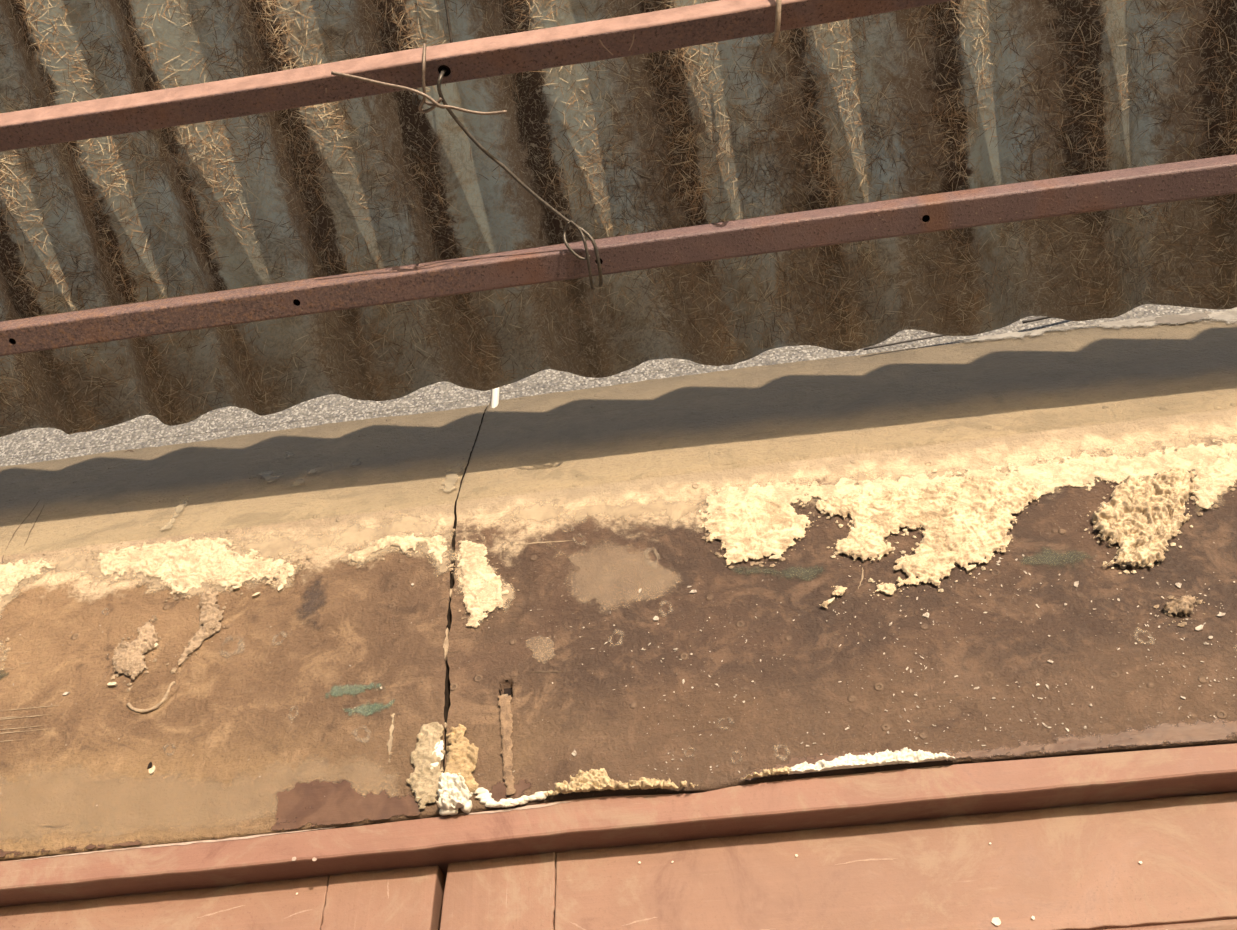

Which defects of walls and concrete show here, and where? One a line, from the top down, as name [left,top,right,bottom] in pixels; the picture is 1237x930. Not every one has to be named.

spalling [698,434,1237,597]
peeling [0,553,59,616]
peeling [81,498,312,692]
peeling [341,529,520,627]
crack [438,408,487,773]
spalling [819,586,847,609]
spalling [1154,595,1205,627]
corrosion [498,680,516,795]
spalling [456,768,698,815]
spalling [737,766,789,780]
spalling [16,824,362,861]